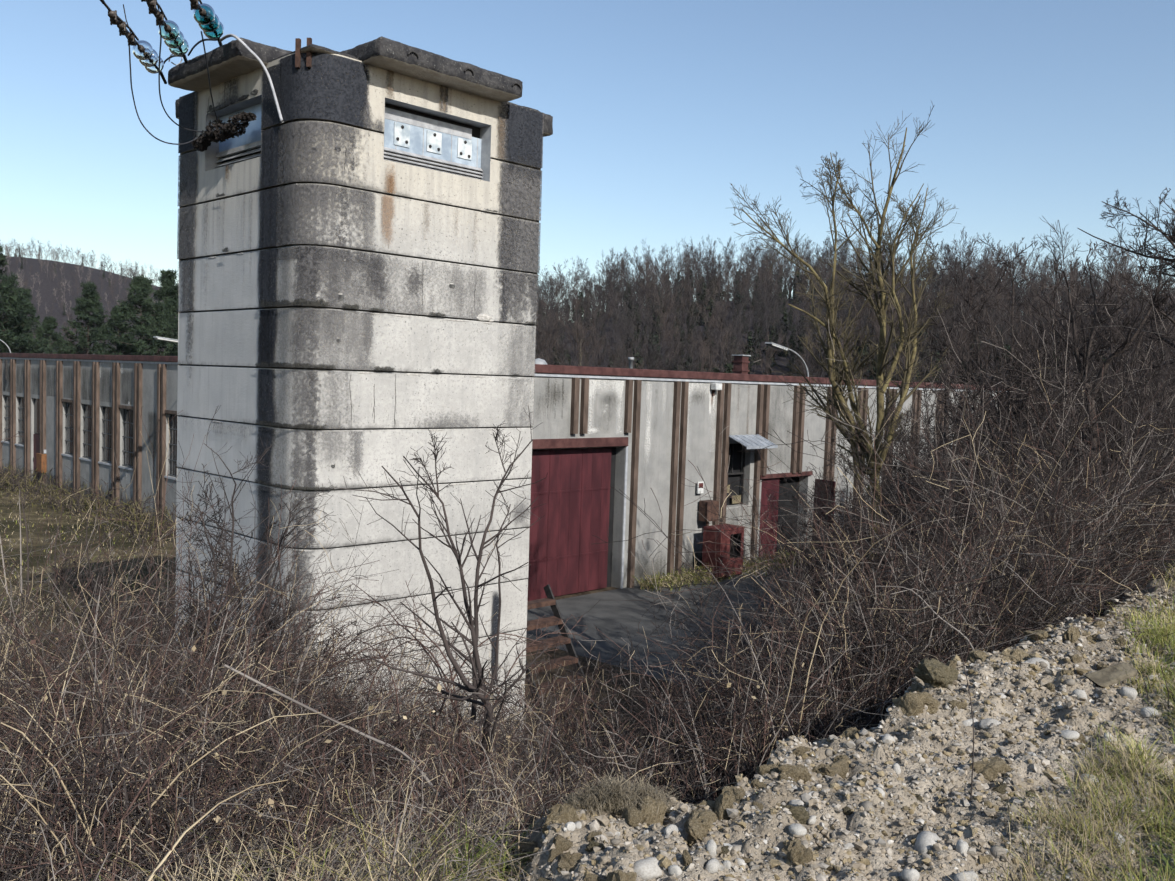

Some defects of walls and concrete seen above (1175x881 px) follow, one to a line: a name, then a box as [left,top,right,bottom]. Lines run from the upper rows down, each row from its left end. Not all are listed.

leakage [177,91,207,363]
leakage [248,52,433,686]
rust [383,174,395,234]
leakage [446,102,544,382]